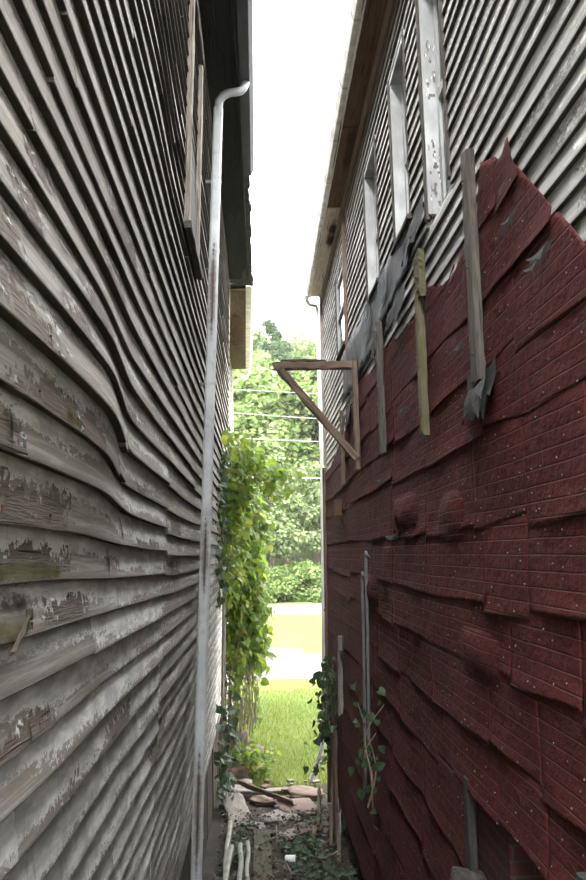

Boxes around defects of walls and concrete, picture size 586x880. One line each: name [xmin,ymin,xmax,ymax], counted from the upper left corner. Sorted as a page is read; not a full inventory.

peeling [548,95,586,161]
peeling [0,408,33,460]
peeling [2,356,107,453]
peeling [0,465,79,575]
peeling [39,591,92,627]
peeling [0,701,59,767]
peeling [147,712,168,767]